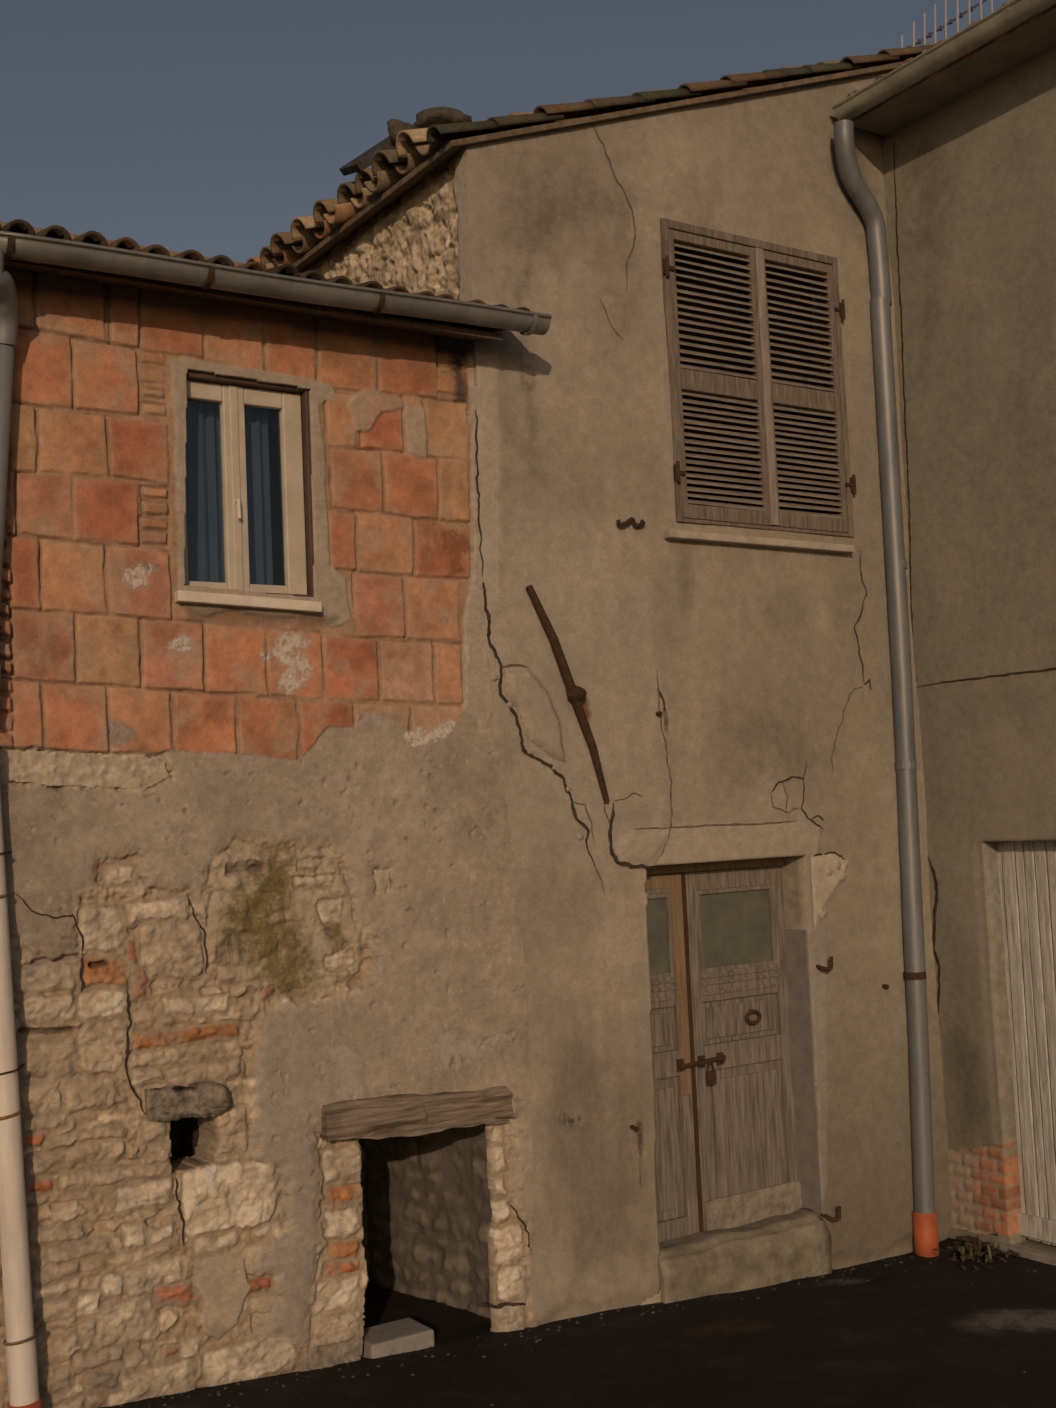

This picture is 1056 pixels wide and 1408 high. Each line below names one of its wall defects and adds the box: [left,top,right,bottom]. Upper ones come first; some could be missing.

crack [592,123,636,338]
crack [893,143,1056,698]
crack [475,410,871,891]
crack [13,892,85,992]
crack [188,898,208,973]
flaking render [811,854,849,930]
crack [928,857,941,1014]
crack [125,992,145,1115]
crack [175,1177,185,1246]
flaking render [10,840,374,1408]
flaking render [948,1141,1022,1237]
flaking render [0,1247,9,1408]